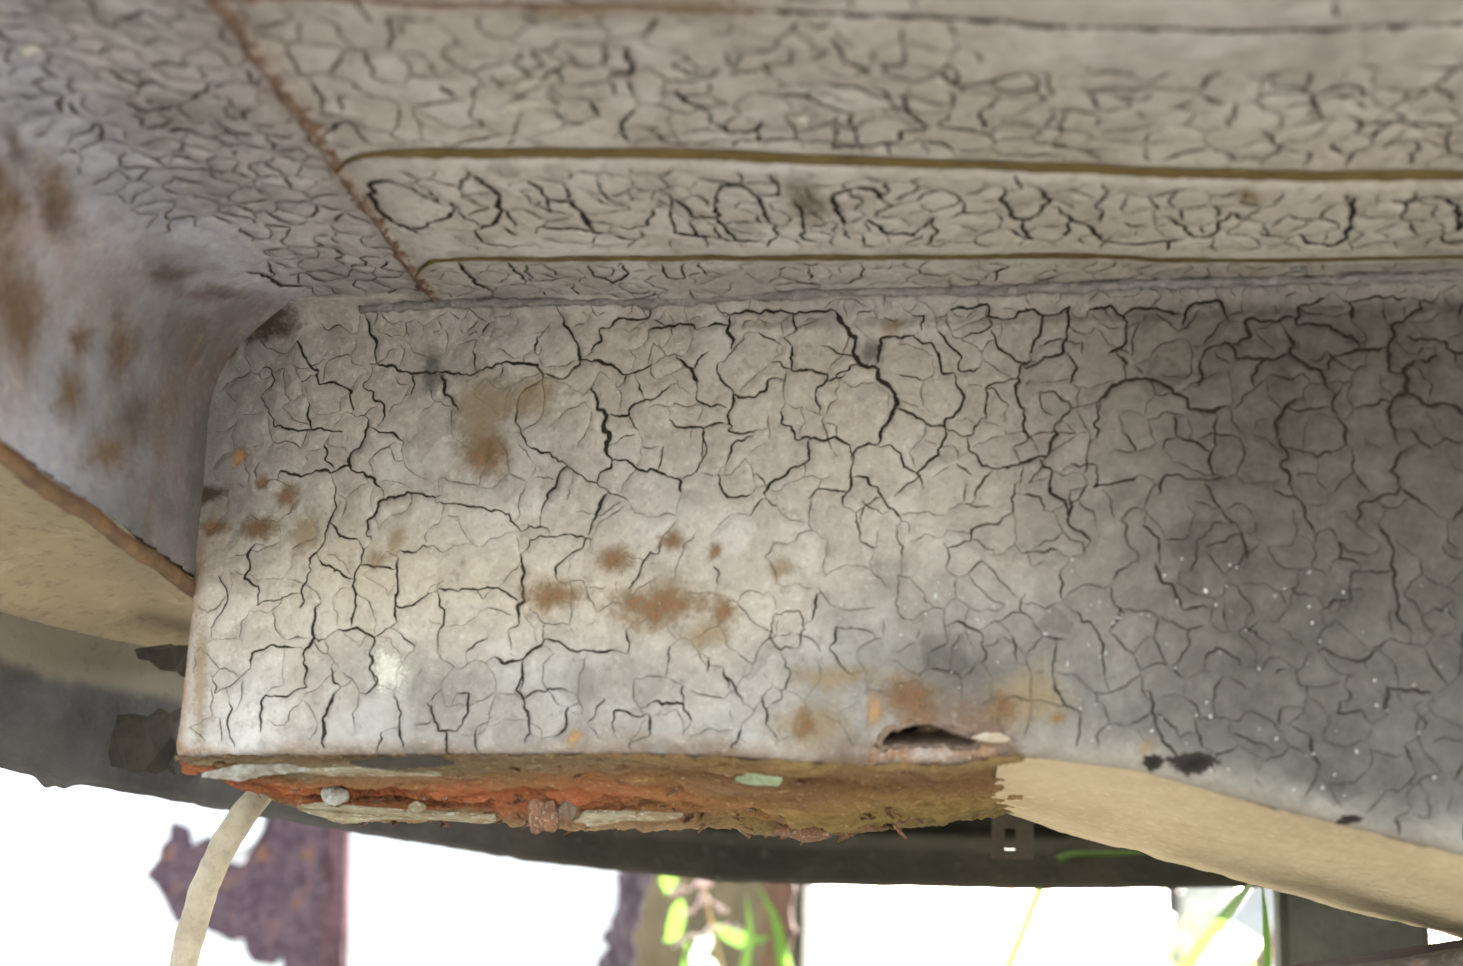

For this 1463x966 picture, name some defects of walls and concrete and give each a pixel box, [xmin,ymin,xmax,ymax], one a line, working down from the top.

rust [597,547,629,571]
rust [662,532,683,549]
rust [710,543,721,559]
crack [189,261,1463,835]
rust [524,582,578,614]
rust [613,587,736,645]
peeling [971,732,1011,743]
peeling [202,764,443,782]
peeling [735,773,783,786]
rust [528,798,578,834]
peeling [572,810,683,827]
rust [773,824,833,843]